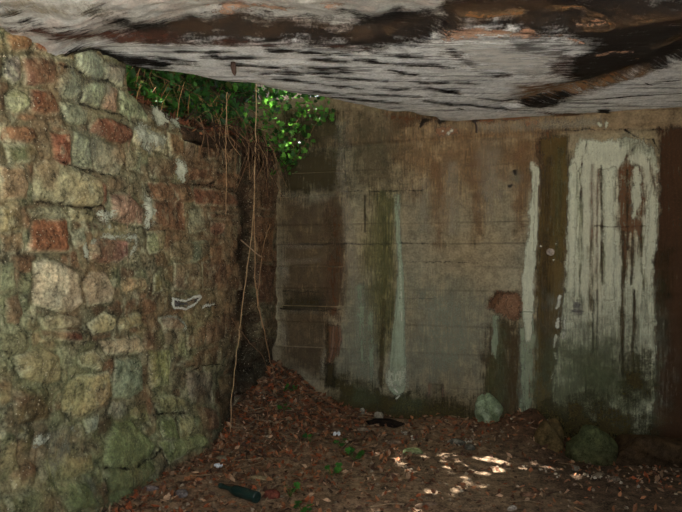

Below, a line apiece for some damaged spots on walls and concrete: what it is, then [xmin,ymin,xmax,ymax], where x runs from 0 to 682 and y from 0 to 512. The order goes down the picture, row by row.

damp [1,9,583,111]
damp [275,107,480,419]
damp [515,120,682,438]
rust [615,147,657,376]